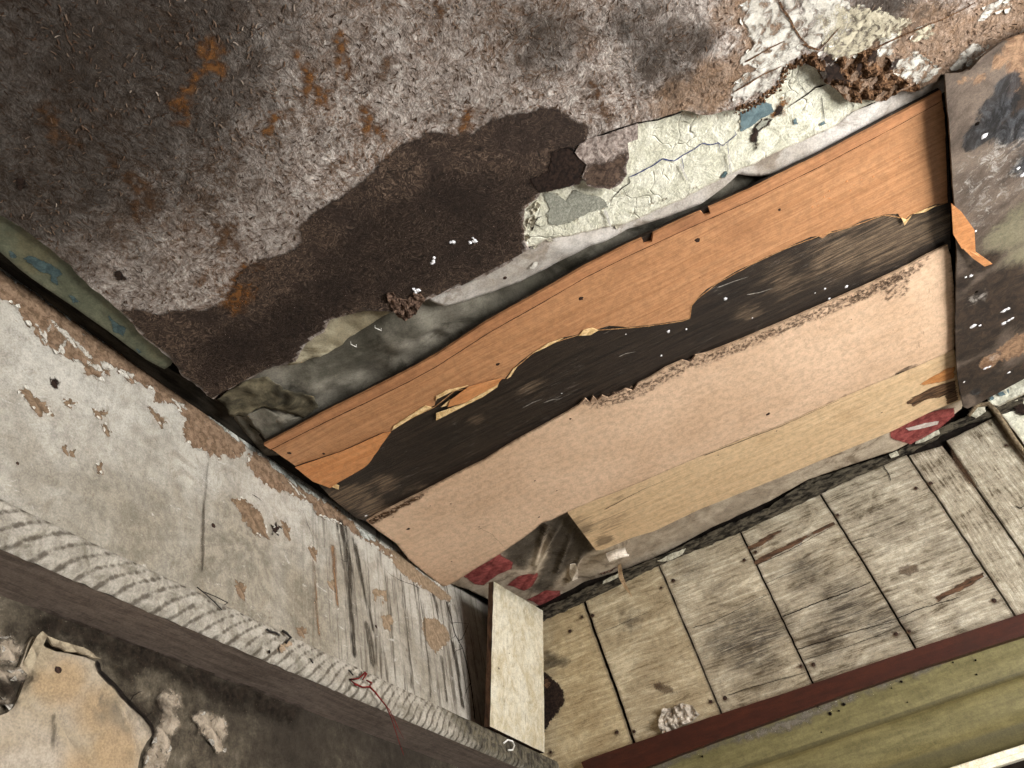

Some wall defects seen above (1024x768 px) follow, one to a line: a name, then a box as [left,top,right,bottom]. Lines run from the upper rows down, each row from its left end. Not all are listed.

peeling [978,0,1011,21]
rust [170,40,226,126]
crack [565,111,683,151]
peeling [523,0,989,249]
water stain [121,107,590,398]
peeling [0,268,452,604]
peeling [372,588,394,632]